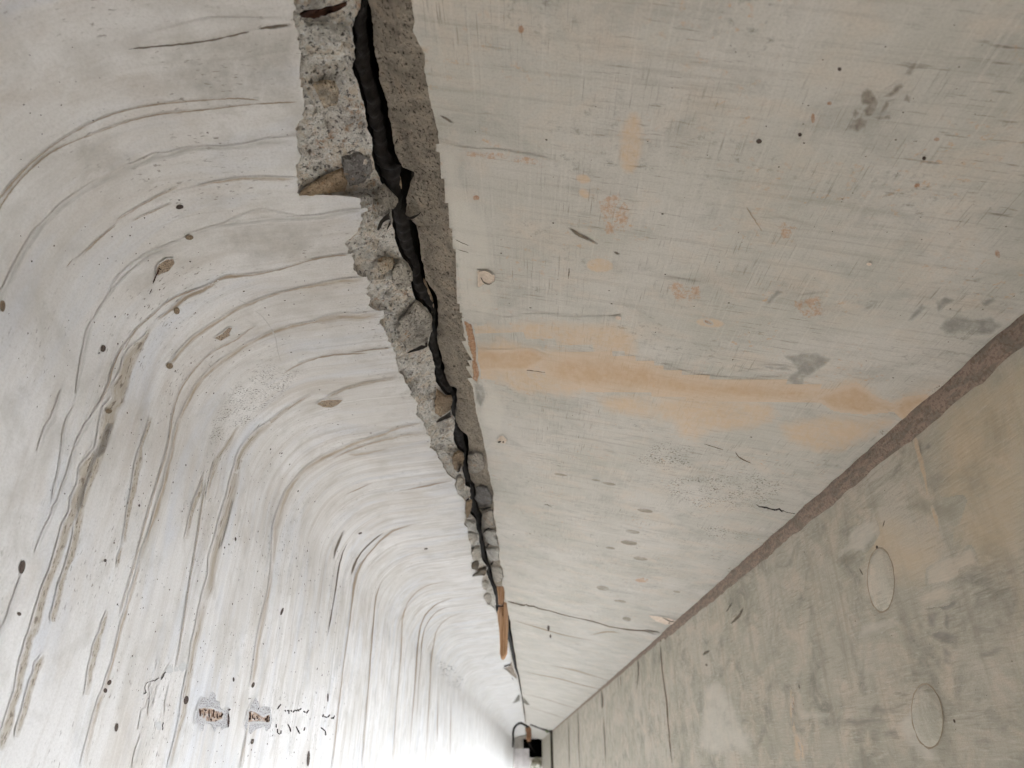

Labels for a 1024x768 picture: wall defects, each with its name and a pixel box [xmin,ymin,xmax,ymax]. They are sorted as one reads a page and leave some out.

water stain [846,58,920,133]
spalling [293,0,532,736]
crack [284,0,672,758]
water stain [436,139,945,459]
crack [756,504,795,514]
spalling [194,691,230,733]